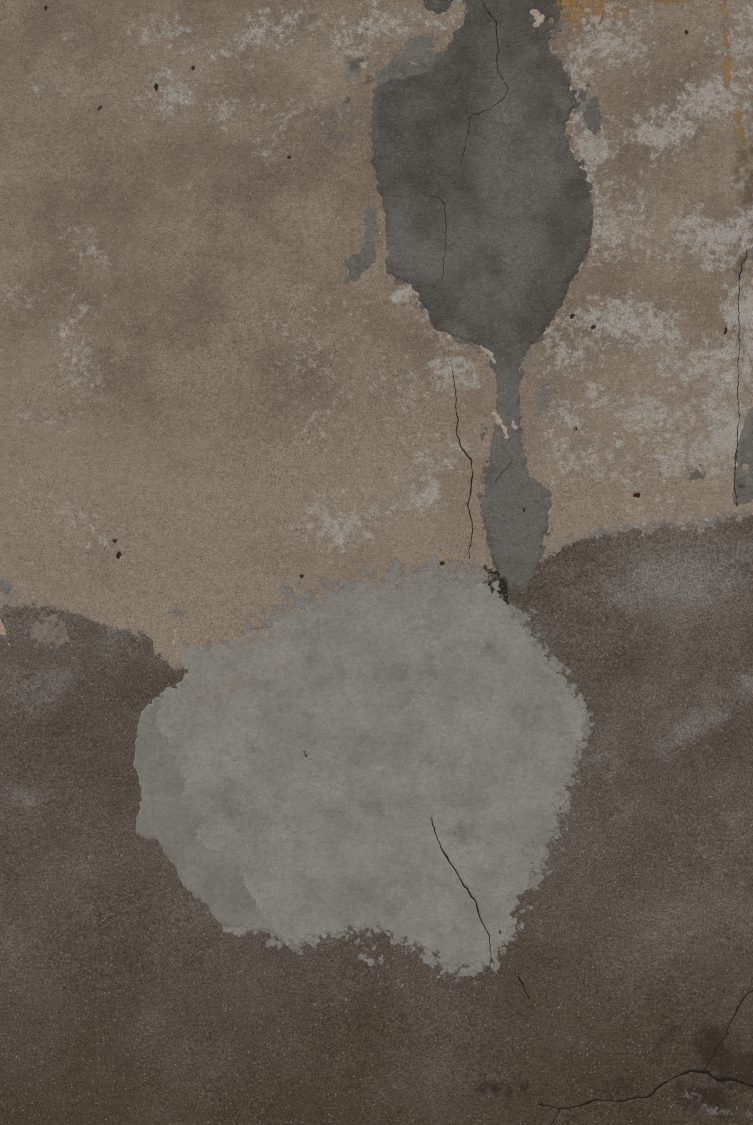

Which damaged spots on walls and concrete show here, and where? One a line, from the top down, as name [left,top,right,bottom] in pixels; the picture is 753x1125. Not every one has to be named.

peeling [530,9,545,27]
corrosion [545,0,694,44]
corrosion [719,0,732,89]
crack [734,251,747,505]
crack [450,360,513,559]
crack [431,818,492,975]
crack [539,990,753,1125]